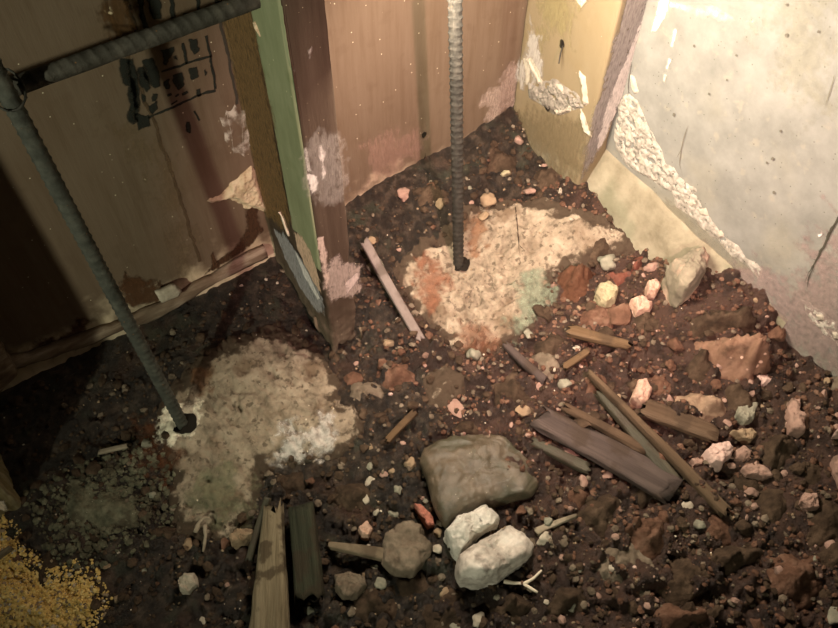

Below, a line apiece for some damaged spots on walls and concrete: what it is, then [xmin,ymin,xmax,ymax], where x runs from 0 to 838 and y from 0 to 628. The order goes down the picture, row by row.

spalling [0,0,261,430]
spalling [526,57,592,137]
spalling [614,74,762,279]
crack [805,217,838,287]